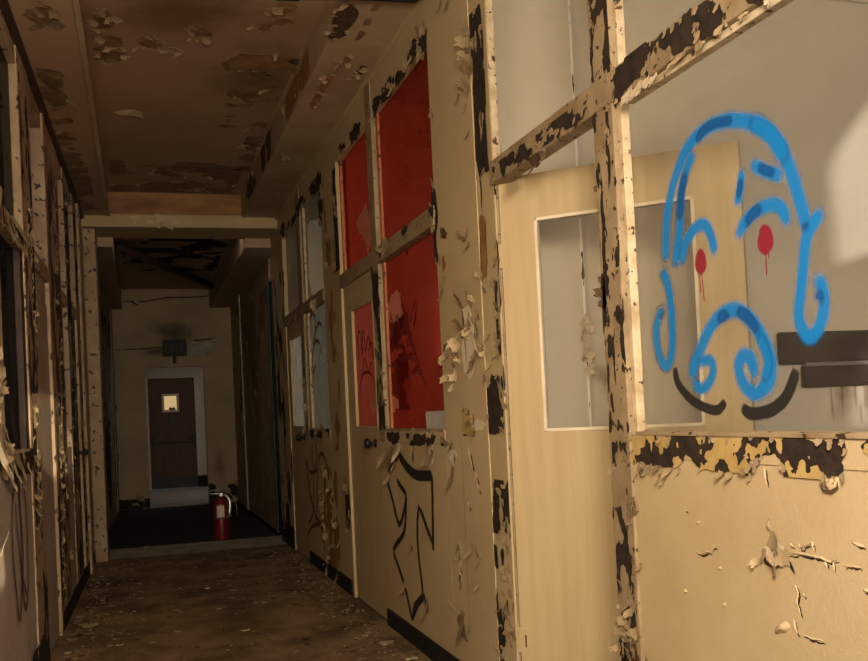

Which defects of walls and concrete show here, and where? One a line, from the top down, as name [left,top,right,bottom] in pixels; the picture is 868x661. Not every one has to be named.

peeling [85,8,166,65]
peeling [323,3,381,42]
peeling [0,96,43,562]
peeling [46,148,90,606]
peeling [108,129,271,208]
peeling [277,21,427,273]
peeling [428,178,507,436]
peeling [453,0,848,486]
peeling [33,570,51,661]
peeling [491,479,516,661]
peeling [609,488,647,661]
peeling [747,530,795,579]